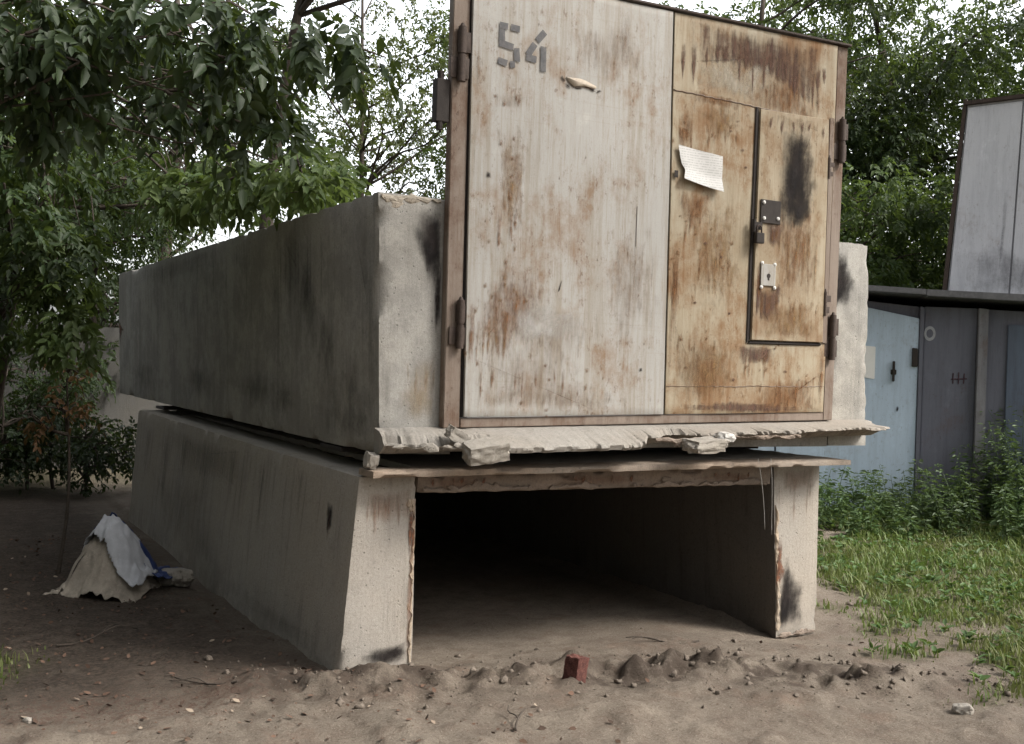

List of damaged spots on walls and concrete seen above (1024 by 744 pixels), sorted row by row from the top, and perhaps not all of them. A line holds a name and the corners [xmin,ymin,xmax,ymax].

corrosion [681,27,826,131]
damp [789,141,808,224]
corrosion [683,197,732,291]
corrosion [756,218,816,333]
corrosion [465,277,536,364]
corrosion [742,345,779,375]
corrosion [698,360,824,412]